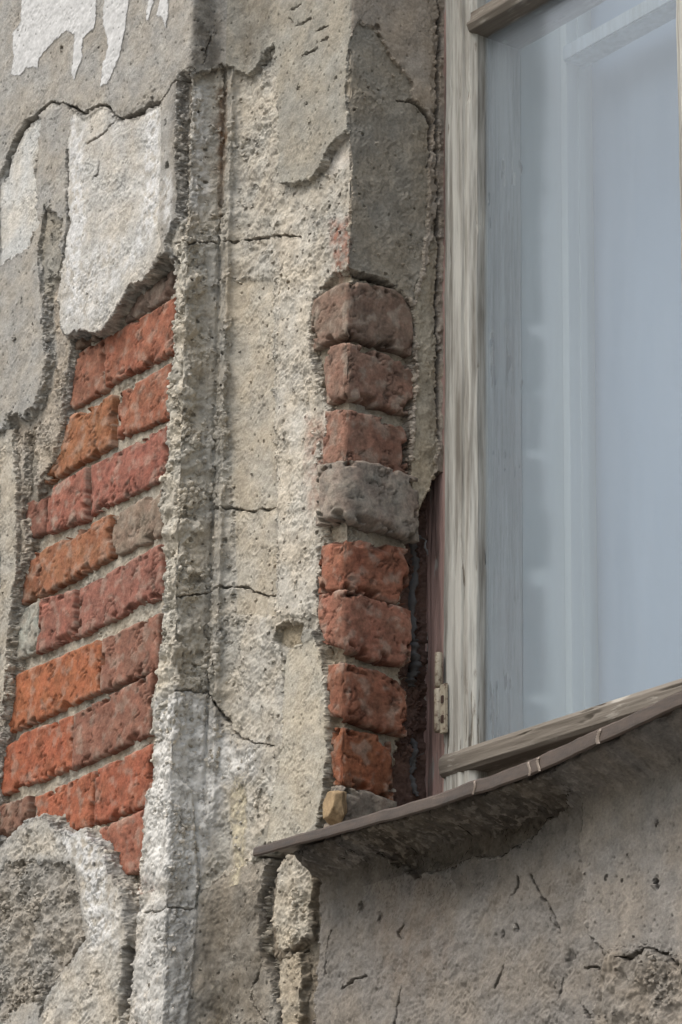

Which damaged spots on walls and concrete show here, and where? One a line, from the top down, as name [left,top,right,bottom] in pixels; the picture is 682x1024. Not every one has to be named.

peeling [11,0,129,87]
peeling [146,0,168,29]
spalling [288,3,329,55]
crack [7,29,215,178]
crack [175,233,302,245]
spalling [0,20,431,1024]
crack [214,504,277,513]
crack [177,577,278,599]
crack [173,687,275,746]
spalling [267,767,569,1024]
crack [562,947,678,984]